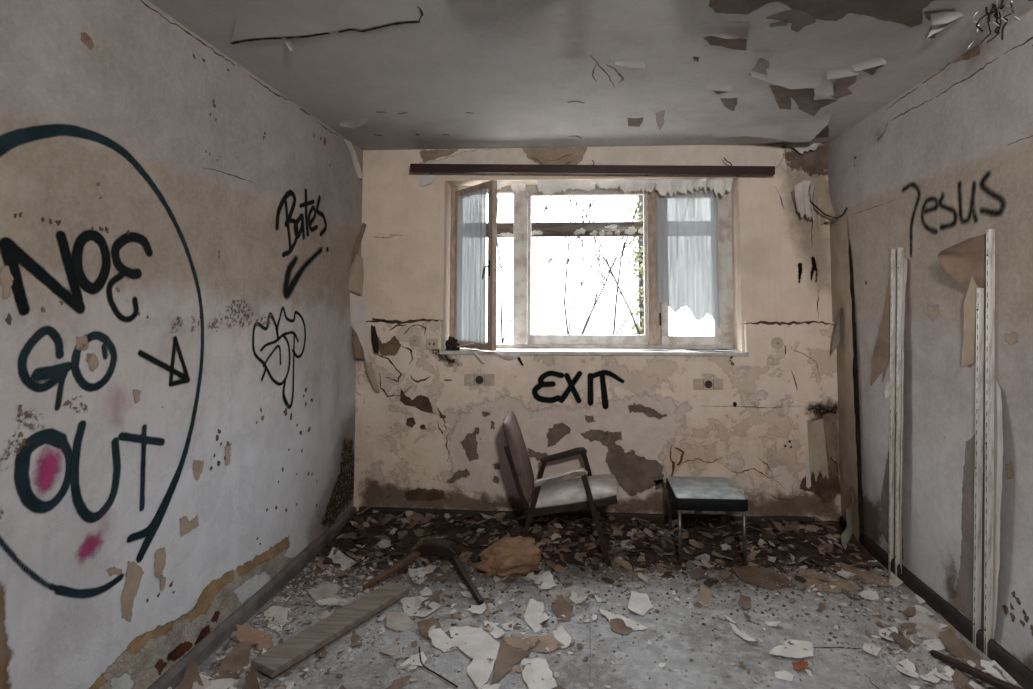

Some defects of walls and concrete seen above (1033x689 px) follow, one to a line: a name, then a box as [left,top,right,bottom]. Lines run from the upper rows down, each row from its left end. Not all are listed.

crack [140,0,338,136]
peeling [952,44,980,63]
crack [437,408,450,461]
peeling [377,324,691,511]
crack [683,455,799,501]
flaking render [767,464,840,503]
peeling [180,515,199,536]
peeling [0,585,13,689]
peeling [200,548,451,689]
peeling [776,563,992,689]
peeling [1002,591,1033,636]